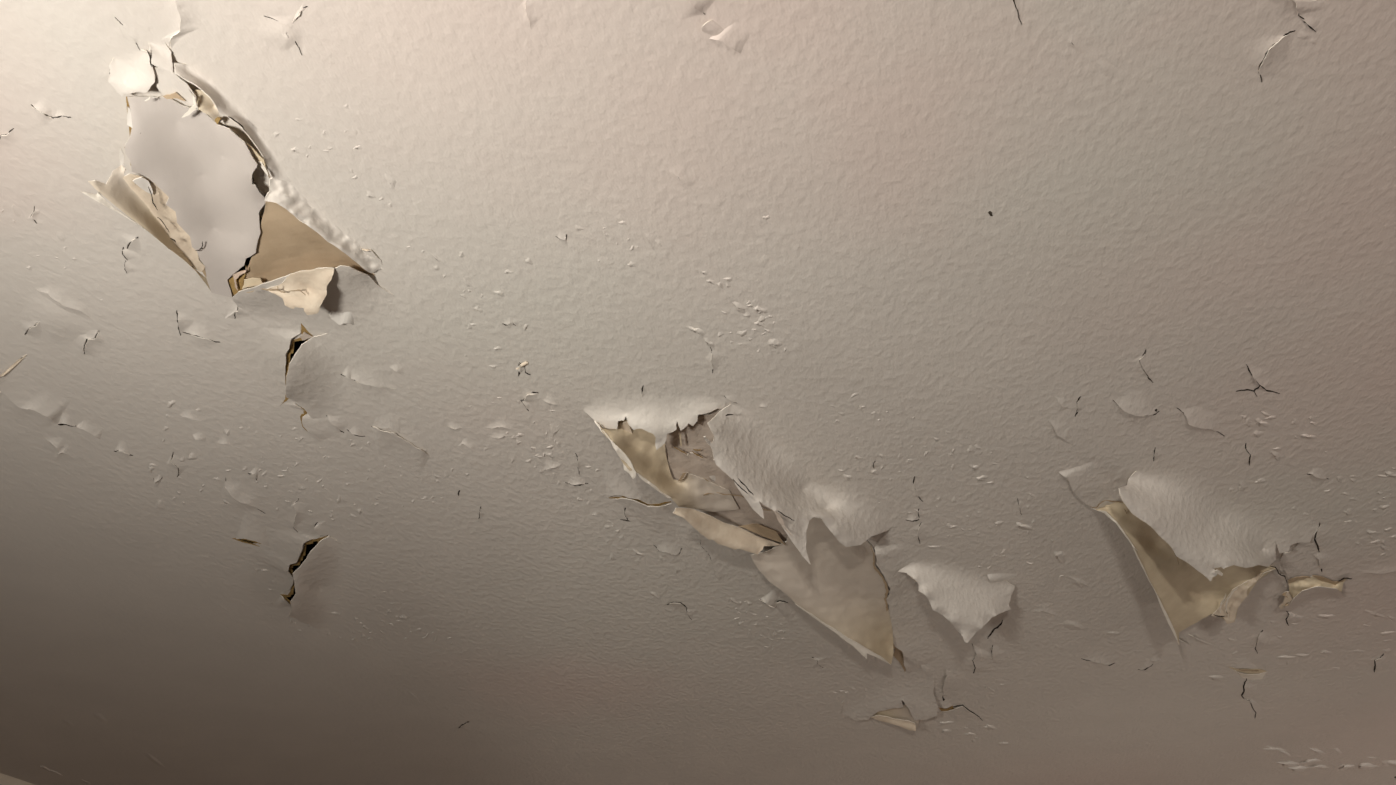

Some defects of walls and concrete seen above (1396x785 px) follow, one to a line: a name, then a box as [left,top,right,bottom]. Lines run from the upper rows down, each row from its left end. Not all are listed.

peeling [82,0,430,475]
peeling [0,354,72,433]
peeling [516,361,562,411]
peeling [232,511,344,630]
peeling [583,387,1017,731]
peeling [1059,460,1352,674]